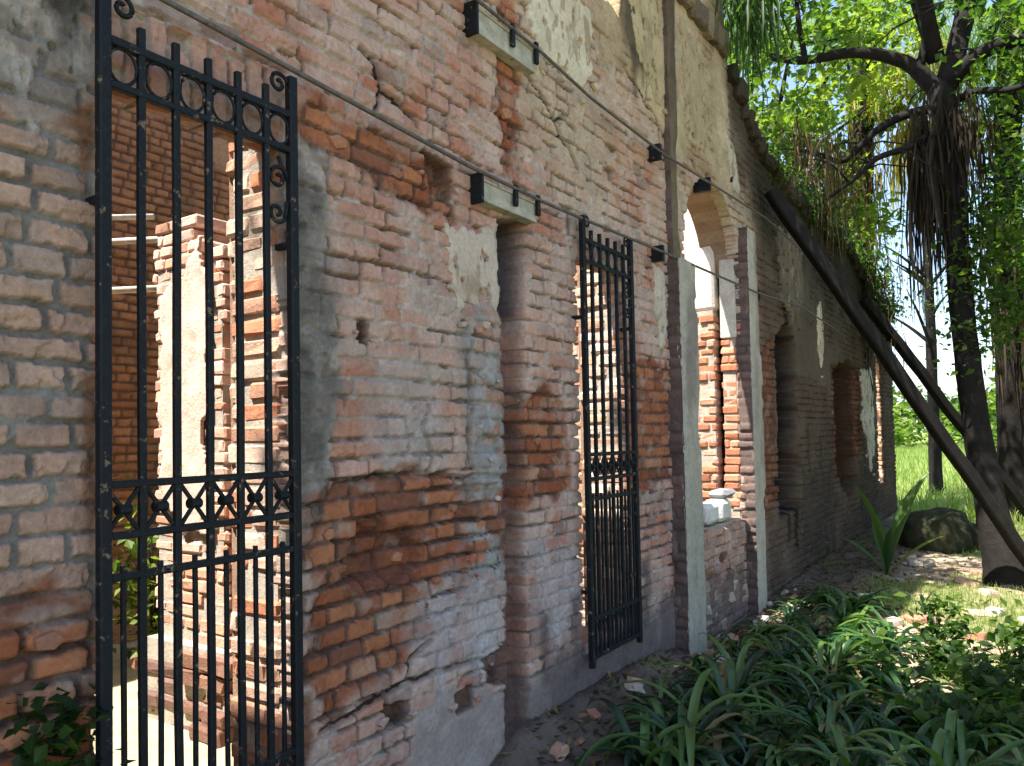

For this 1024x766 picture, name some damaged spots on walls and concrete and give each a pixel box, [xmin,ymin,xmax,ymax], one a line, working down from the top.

crack [362,54,412,120]
spalling [495,57,519,172]
peeling [497,0,599,104]
peeling [628,0,668,115]
peeling [679,14,740,203]
spalling [298,95,500,330]
spalling [352,323,375,344]
peeling [859,367,875,476]
spalling [303,386,570,721]
spalling [376,701,419,727]